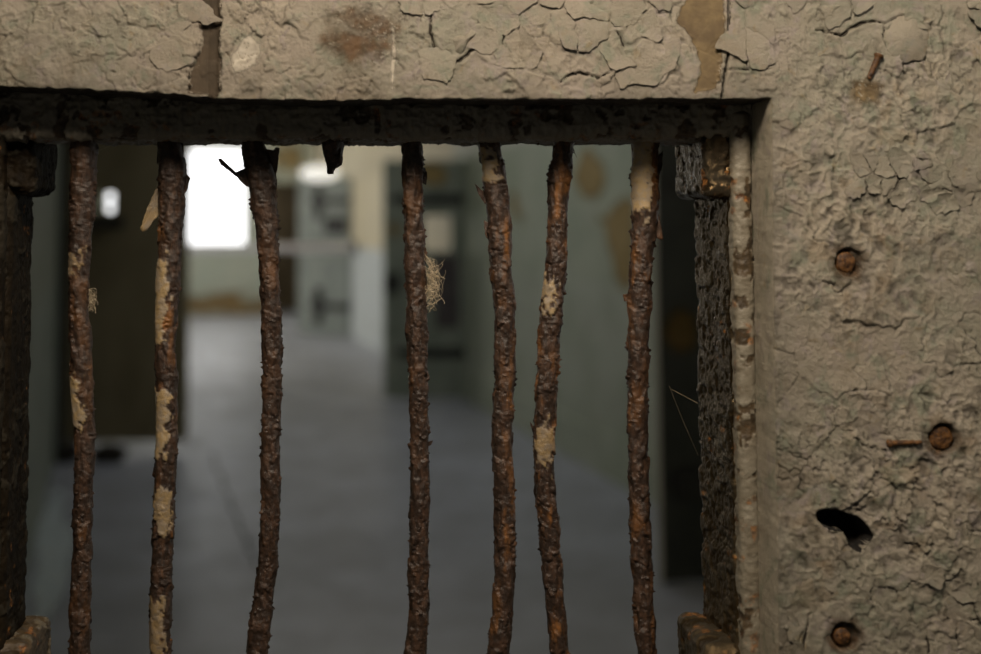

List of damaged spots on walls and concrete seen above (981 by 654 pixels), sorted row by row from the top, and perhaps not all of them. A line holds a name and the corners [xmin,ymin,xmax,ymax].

peeling [966,0,981,28]
crack [428,15,436,48]
crack [456,49,474,63]
crack [560,71,610,83]
rust [267,147,280,198]
peeling [844,146,981,215]